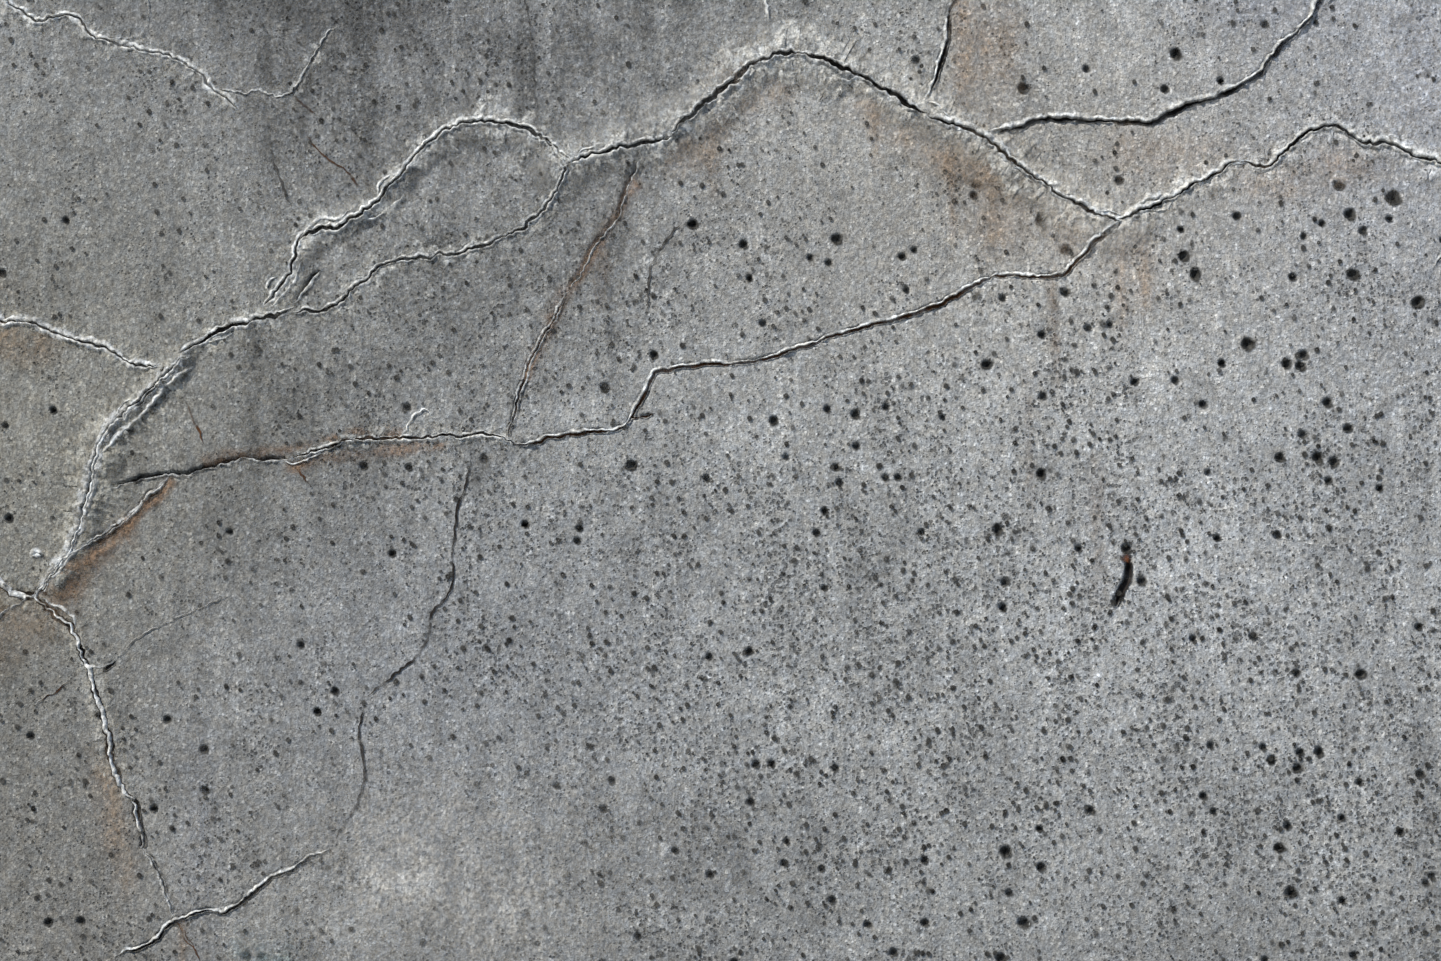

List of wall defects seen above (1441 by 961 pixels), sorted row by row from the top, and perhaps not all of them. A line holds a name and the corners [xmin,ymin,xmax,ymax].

crack [760,0,1441,360]
corrosion [58,480,174,605]
crack [0,0,951,917]
crack [120,866,296,961]